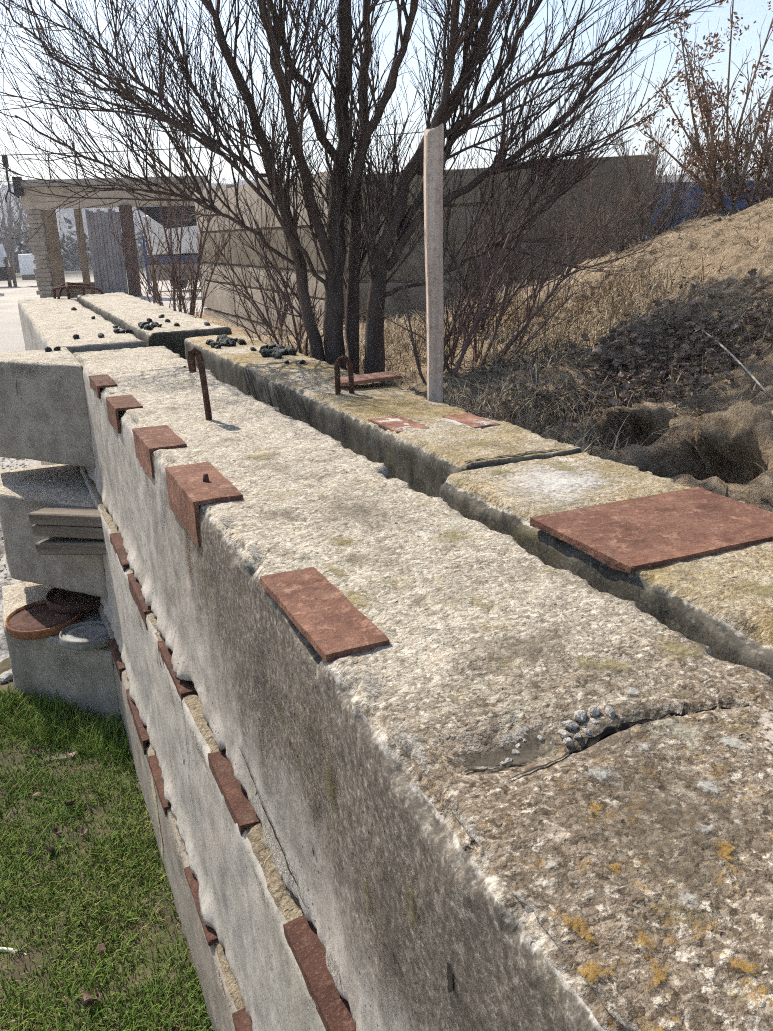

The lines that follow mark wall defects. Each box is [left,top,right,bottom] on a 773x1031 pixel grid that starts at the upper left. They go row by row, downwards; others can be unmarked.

spalling [386,720,559,774]
crack [464,705,749,780]